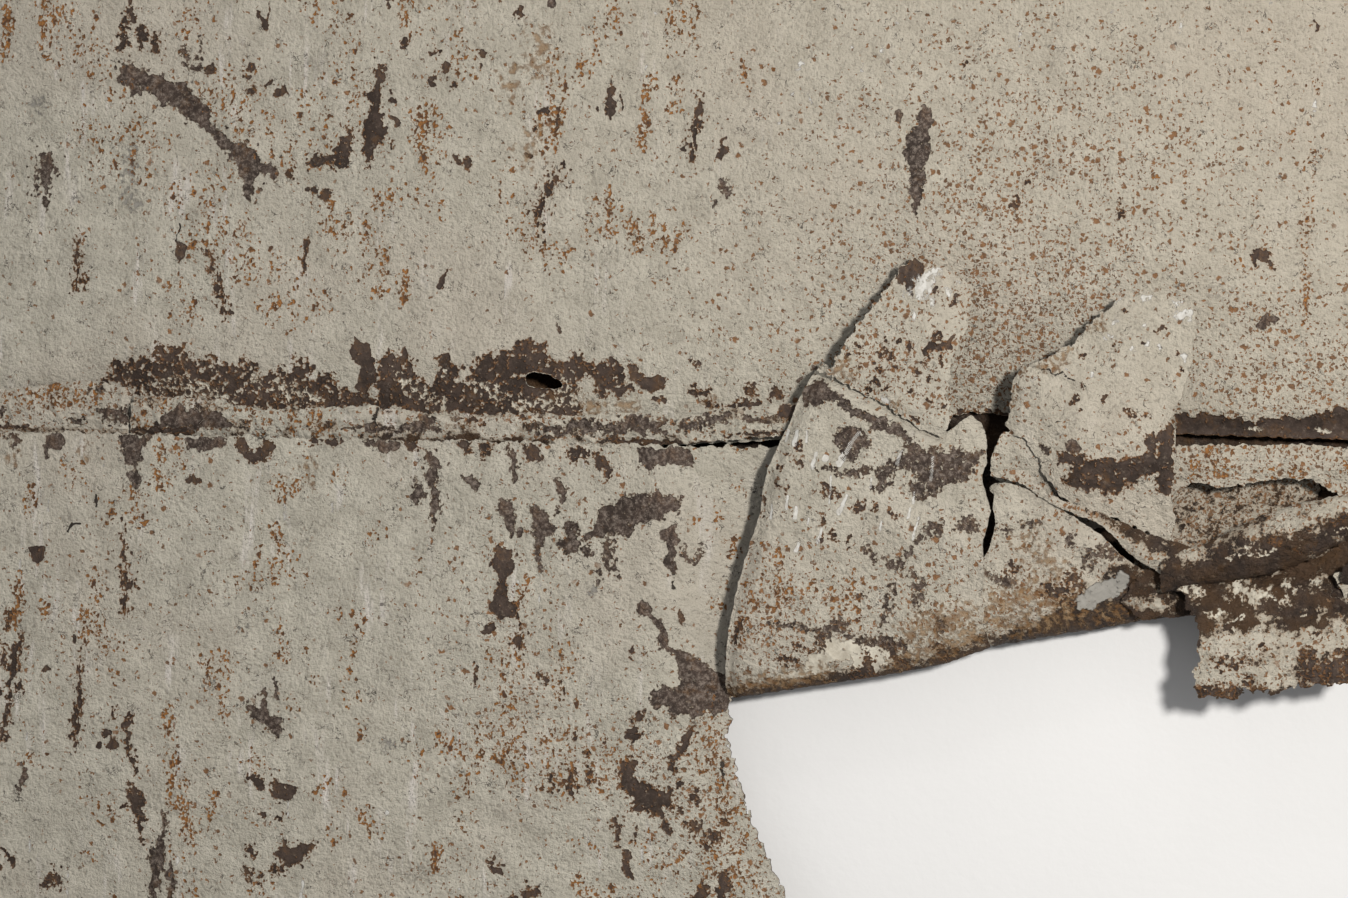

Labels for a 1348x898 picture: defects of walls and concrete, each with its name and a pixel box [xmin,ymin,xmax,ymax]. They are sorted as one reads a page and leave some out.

corrosion [1008,179,1032,211]
crack [371,407,379,426]
peeling [844,330,948,413]
peeling [1068,382,1084,412]
corrosion [0,0,986,898]
peeling [1225,542,1277,562]
peeling [1075,570,1130,610]
peeling [1177,578,1323,634]
corrosion [407,489,1155,898]
peeling [774,636,894,680]
corrosion [1196,642,1273,700]
corrosion [1297,631,1348,687]